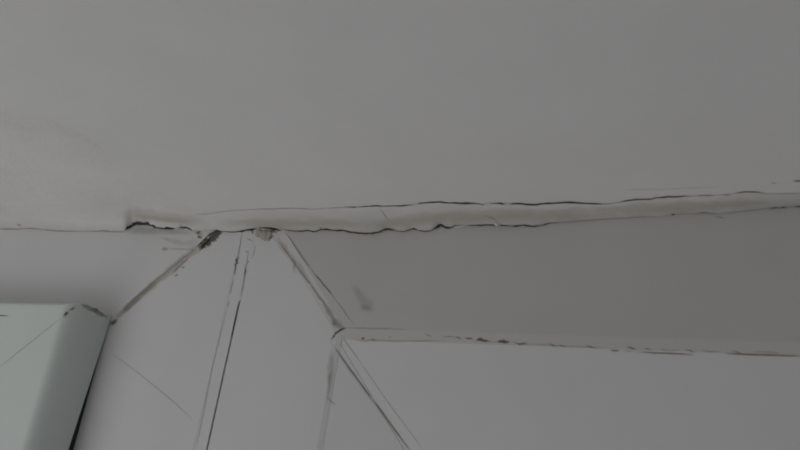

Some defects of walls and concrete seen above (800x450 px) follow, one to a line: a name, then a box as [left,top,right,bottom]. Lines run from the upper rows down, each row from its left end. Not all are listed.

crack [625,194,708,202]
crack [352,200,477,208]
crack [496,200,599,208]
crack [288,223,550,234]